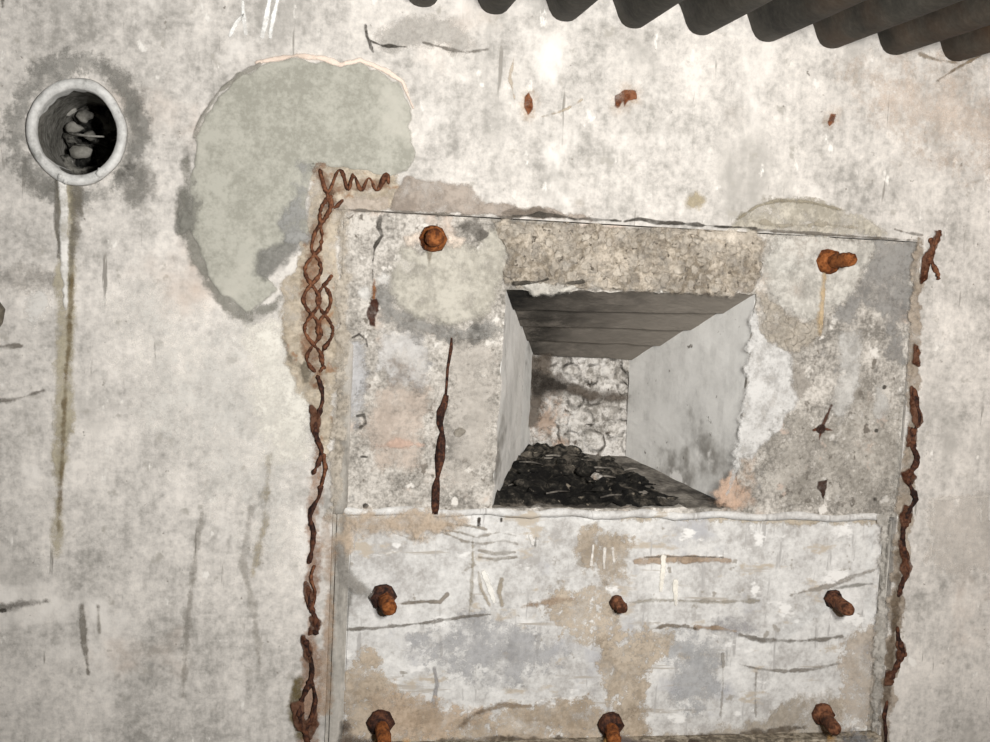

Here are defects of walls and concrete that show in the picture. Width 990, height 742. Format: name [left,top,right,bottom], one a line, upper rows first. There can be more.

water stain [93,63,152,206]
rust [524,93,533,114]
rust [615,90,637,108]
water stain [4,53,91,550]
water stain [130,301,309,566]
rust [309,405,321,459]
rust [367,286,379,326]
spalling [281,163,765,555]
spalling [709,237,924,742]
rust [920,231,942,284]
rust [290,500,321,740]
peeling [343,524,731,742]